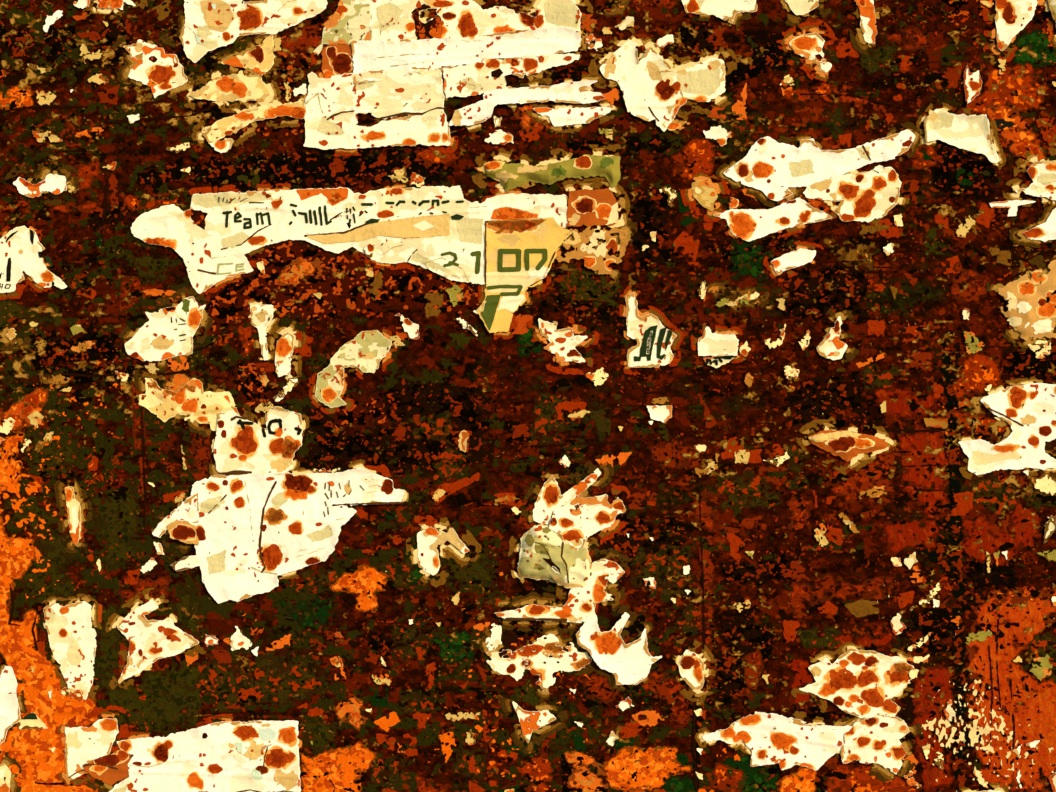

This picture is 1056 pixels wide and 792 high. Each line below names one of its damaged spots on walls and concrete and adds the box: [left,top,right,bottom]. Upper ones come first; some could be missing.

rust [0,0,395,349]
peeling [985,104,1056,167]
peeling [0,387,49,492]
peeling [330,564,388,613]
peeling [0,516,99,792]
rust [68,678,105,728]